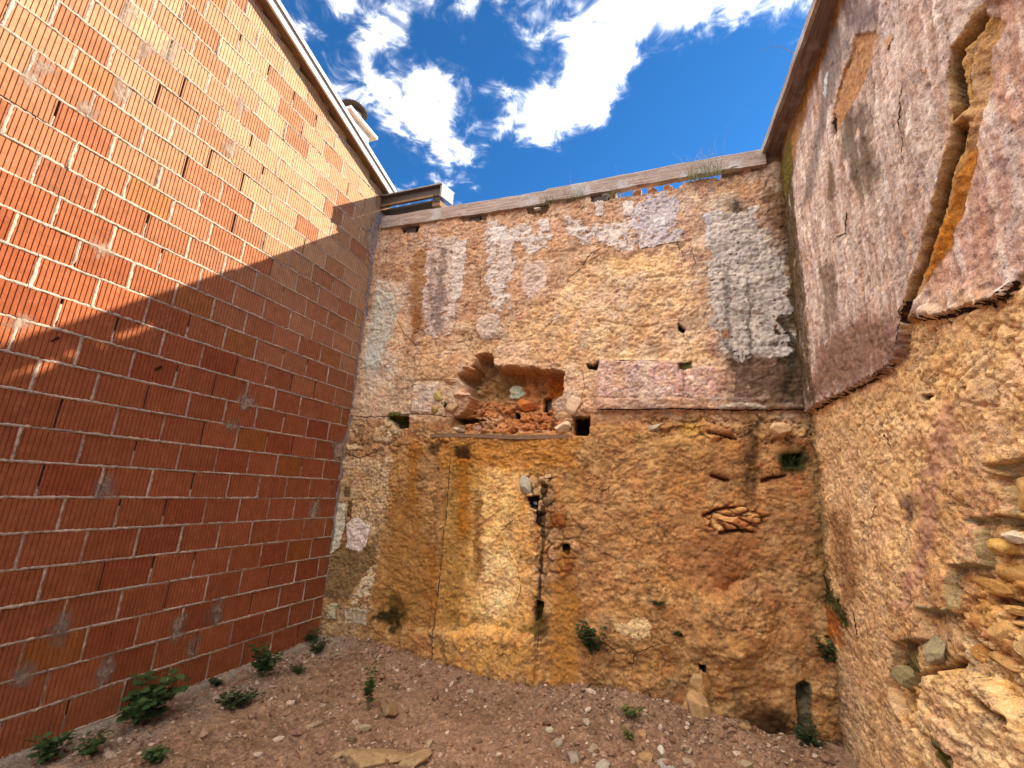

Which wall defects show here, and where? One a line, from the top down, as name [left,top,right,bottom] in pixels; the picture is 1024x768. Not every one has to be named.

spalling [832,32,893,139]
peeling [421,235,469,339]
spalling [453,218,566,435]
spalling [549,191,690,352]
peeling [685,205,798,409]
crack [431,448,452,660]
spalling [889,405,1024,768]